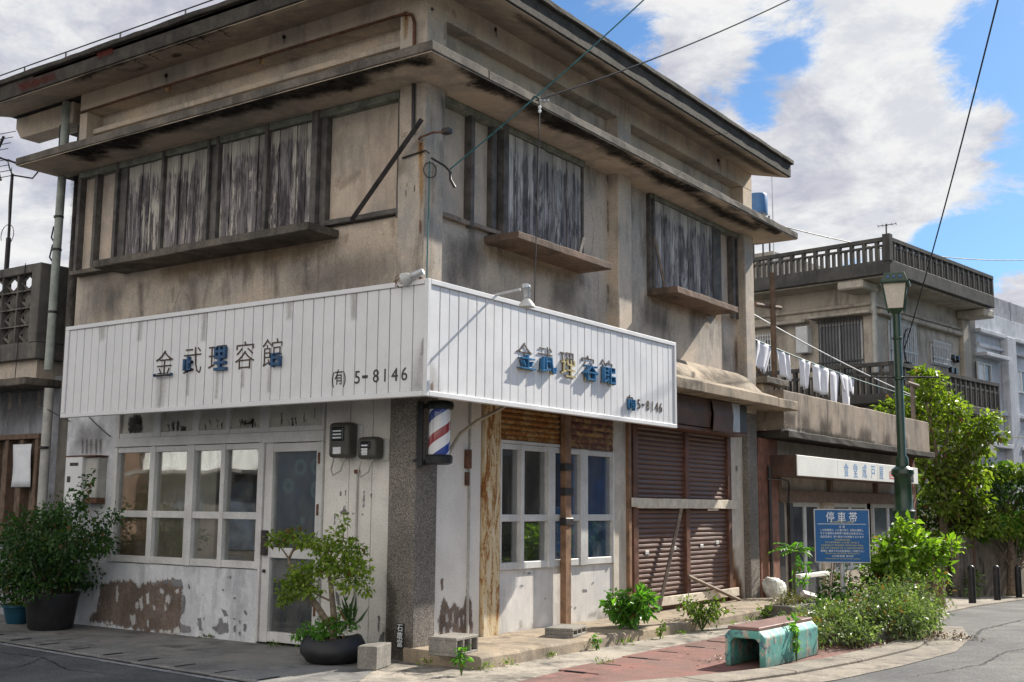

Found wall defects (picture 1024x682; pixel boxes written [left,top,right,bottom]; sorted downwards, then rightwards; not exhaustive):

water stain [62,56,431,161]
water stain [461,67,781,234]
water stain [529,23,773,174]
peeling [90,577,247,638]
peeling [437,579,473,635]